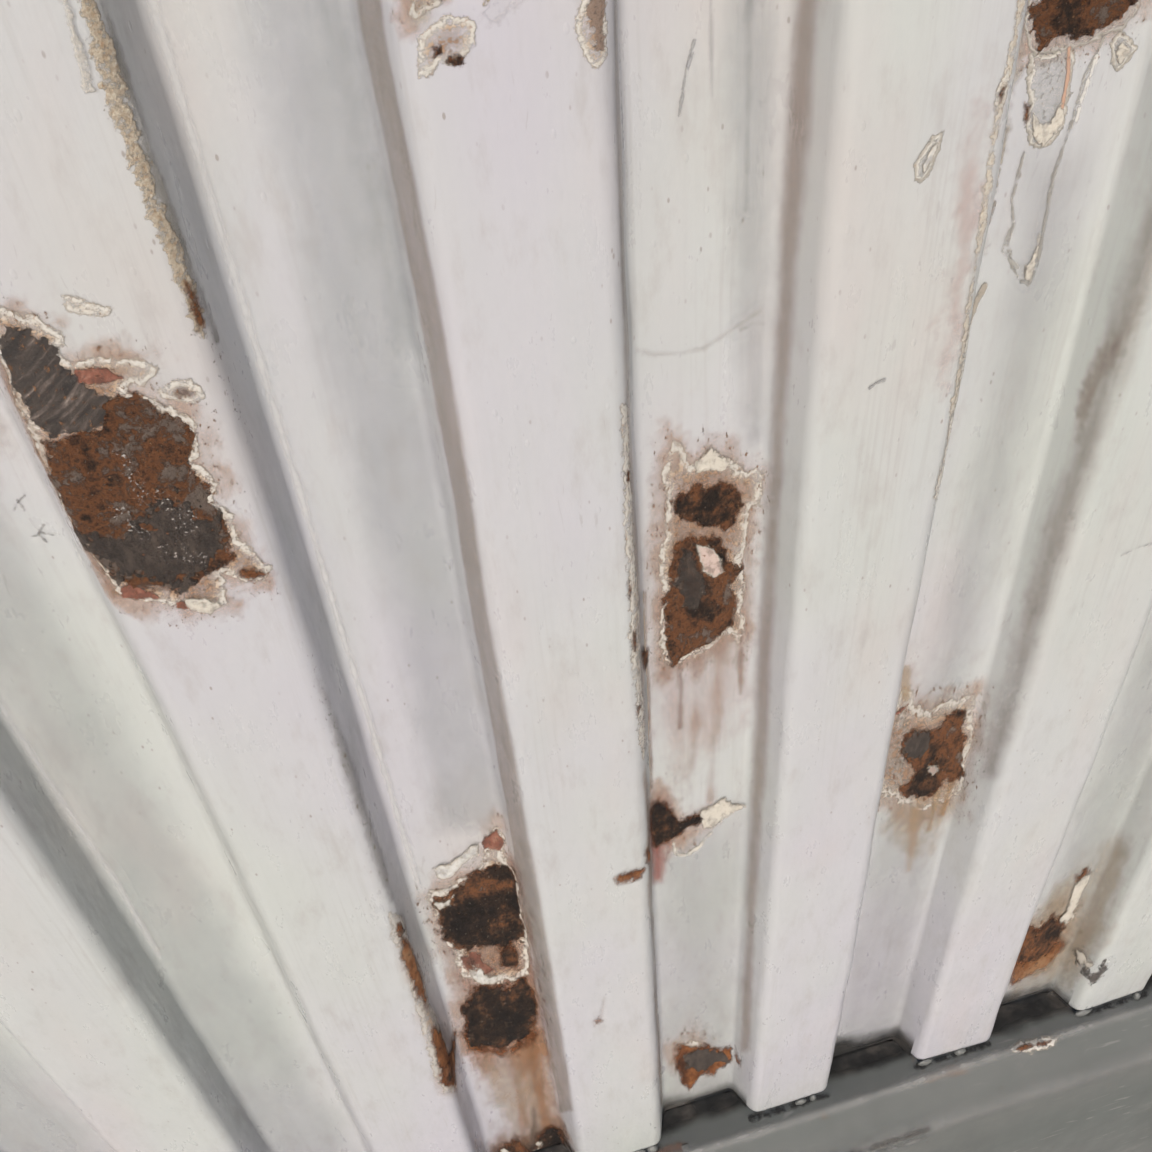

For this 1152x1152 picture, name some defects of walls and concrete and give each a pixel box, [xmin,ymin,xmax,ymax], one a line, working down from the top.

peeling [417,15,477,79]
peeling [575,0,608,69]
rust [1020,0,1145,71]
peeling [61,0,223,362]
peeling [934,0,1138,500]
rust [0,297,278,626]
peeling [620,403,650,768]
rust [646,428,770,681]
rust [877,672,994,829]
rust [389,813,547,1093]
rust [673,1030,740,1089]
rust [1011,867,1107,984]